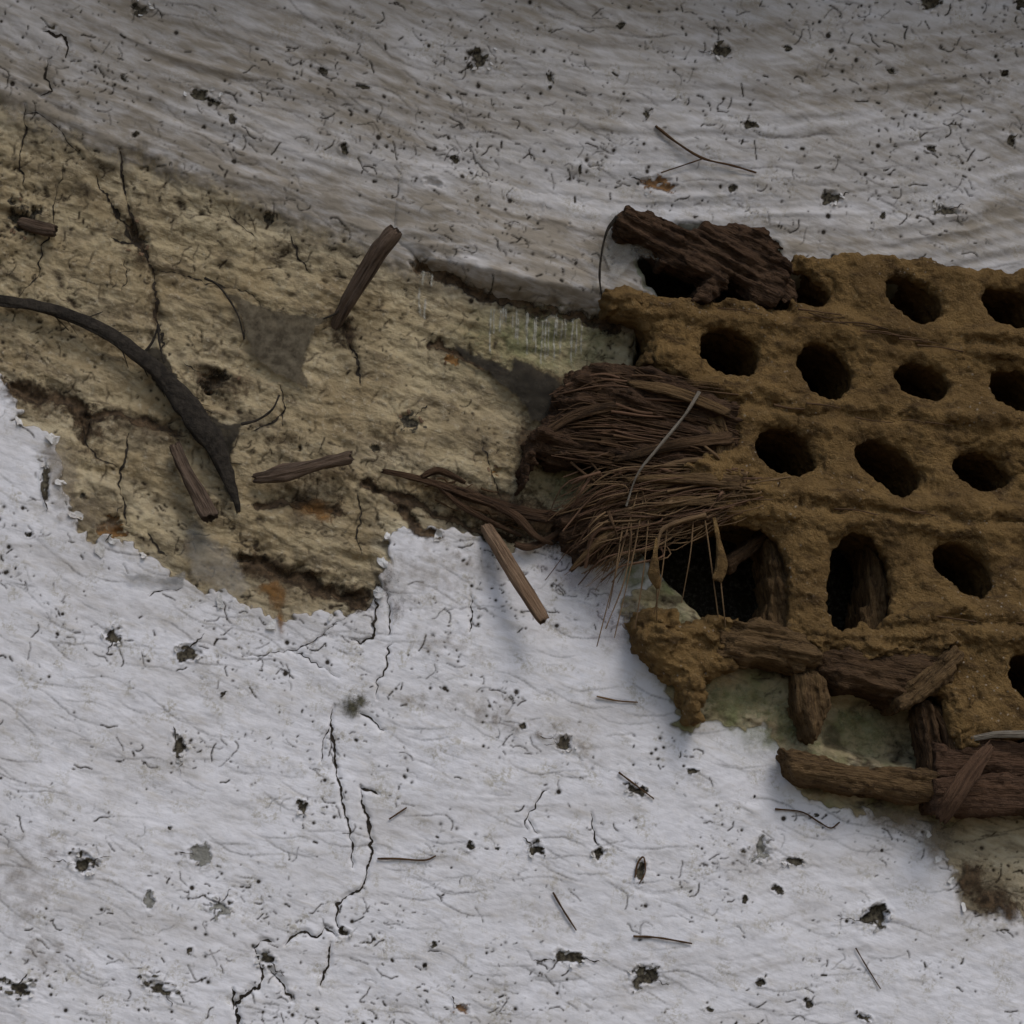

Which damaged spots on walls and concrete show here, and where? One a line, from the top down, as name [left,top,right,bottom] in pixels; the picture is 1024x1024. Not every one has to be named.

spalling [183,84,237,124]
crack [18,30,261,348]
crack [290,234,310,273]
peeling [0,104,634,629]
peeling [618,581,701,623]
spalling [101,624,122,653]
spalling [174,635,203,662]
crack [254,587,391,730]
peeling [664,668,916,769]
spalling [173,727,187,771]
spalling [296,799,308,818]
crack [232,709,377,1024]